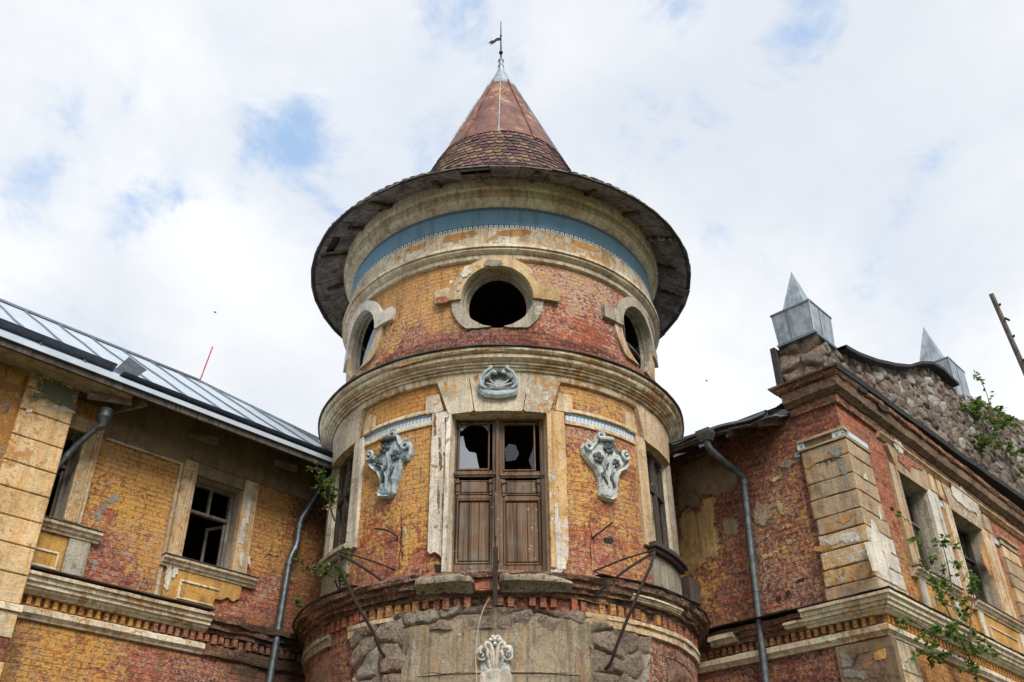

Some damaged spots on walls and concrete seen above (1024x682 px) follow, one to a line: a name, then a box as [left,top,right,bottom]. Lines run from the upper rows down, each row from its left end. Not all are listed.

peeling [443,230,477,242]
peeling [497,229,534,237]
peeling [26,401,76,413]
peeling [85,494,178,595]
peeling [433,413,446,528]
peeling [553,468,566,571]
peeling [679,494,739,578]
peeling [753,458,816,559]
flaking render [106,574,333,682]